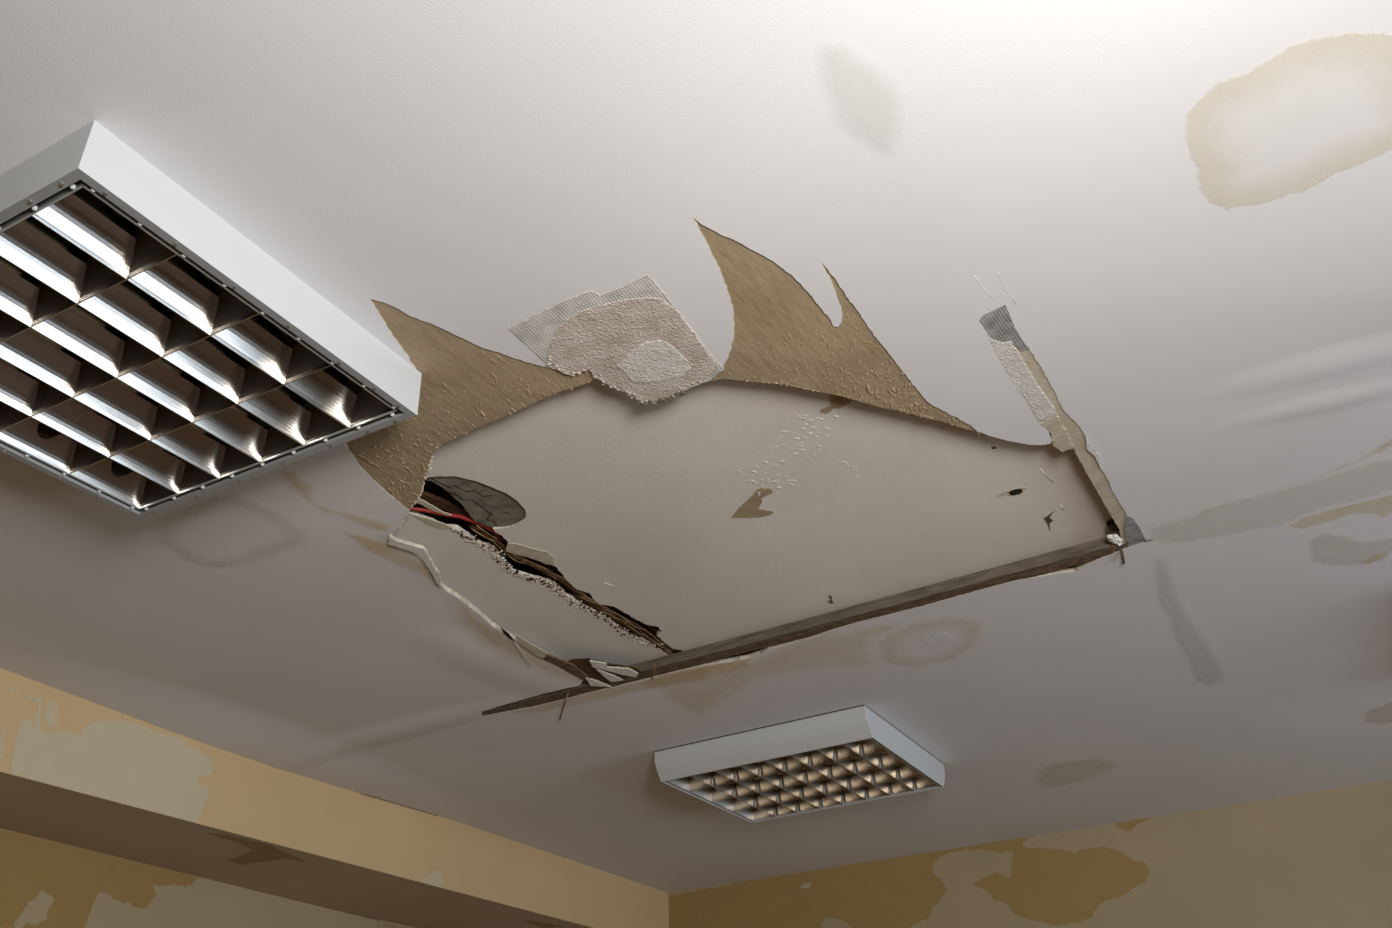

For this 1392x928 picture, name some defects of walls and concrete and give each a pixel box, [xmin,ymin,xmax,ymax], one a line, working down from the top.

peeling [346,299,597,510]
peeling [695,220,981,435]
crack [410,476,680,655]
peeling [585,660,638,687]